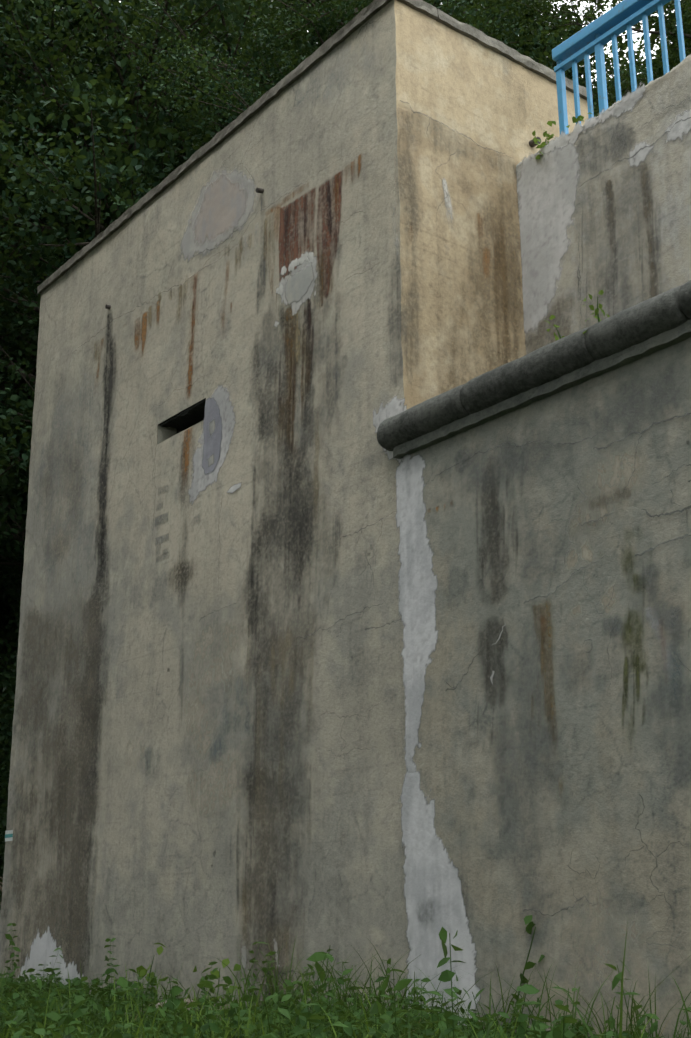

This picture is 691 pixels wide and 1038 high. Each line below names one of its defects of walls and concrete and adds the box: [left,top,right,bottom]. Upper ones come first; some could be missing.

rust [135,296,161,354]
rust [178,278,196,396]
peeling [276,252,314,295]
rust [264,154,361,445]
leakage [606,179,614,252]
leakage [641,165,658,298]
crack [431,413,691,694]
leakage [9,315,116,977]
leakage [479,620,506,704]
rust [535,603,556,741]
crack [523,794,682,953]